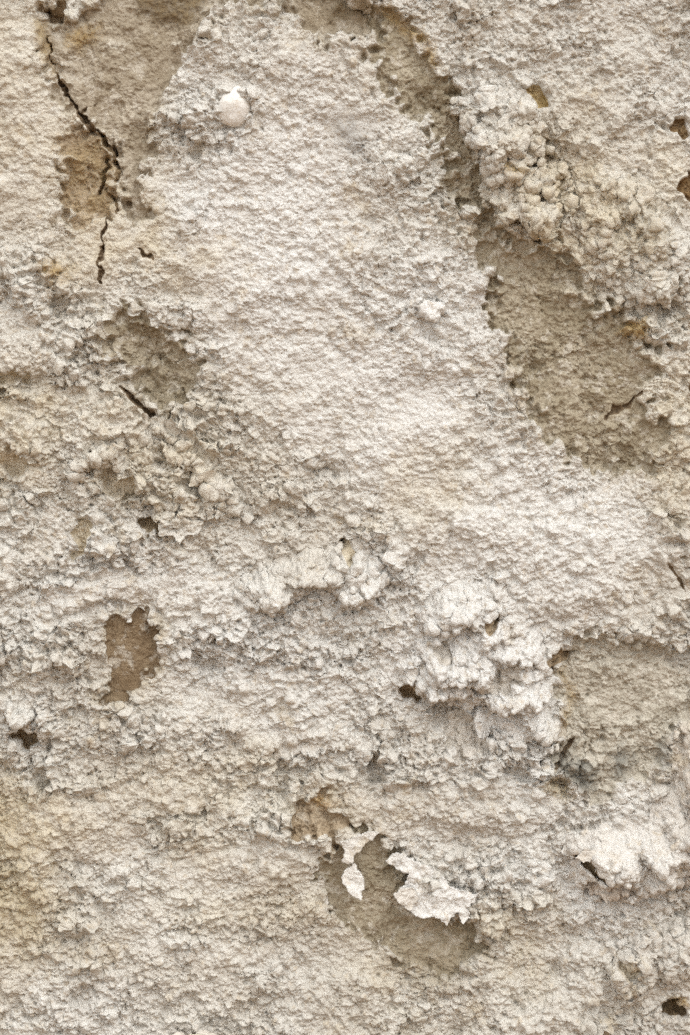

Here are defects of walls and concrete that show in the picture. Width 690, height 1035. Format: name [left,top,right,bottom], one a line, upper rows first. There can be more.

crack [46,35,122,285]
spalling [98,606,161,707]
spalling [547,630,690,803]
spalling [291,786,495,978]